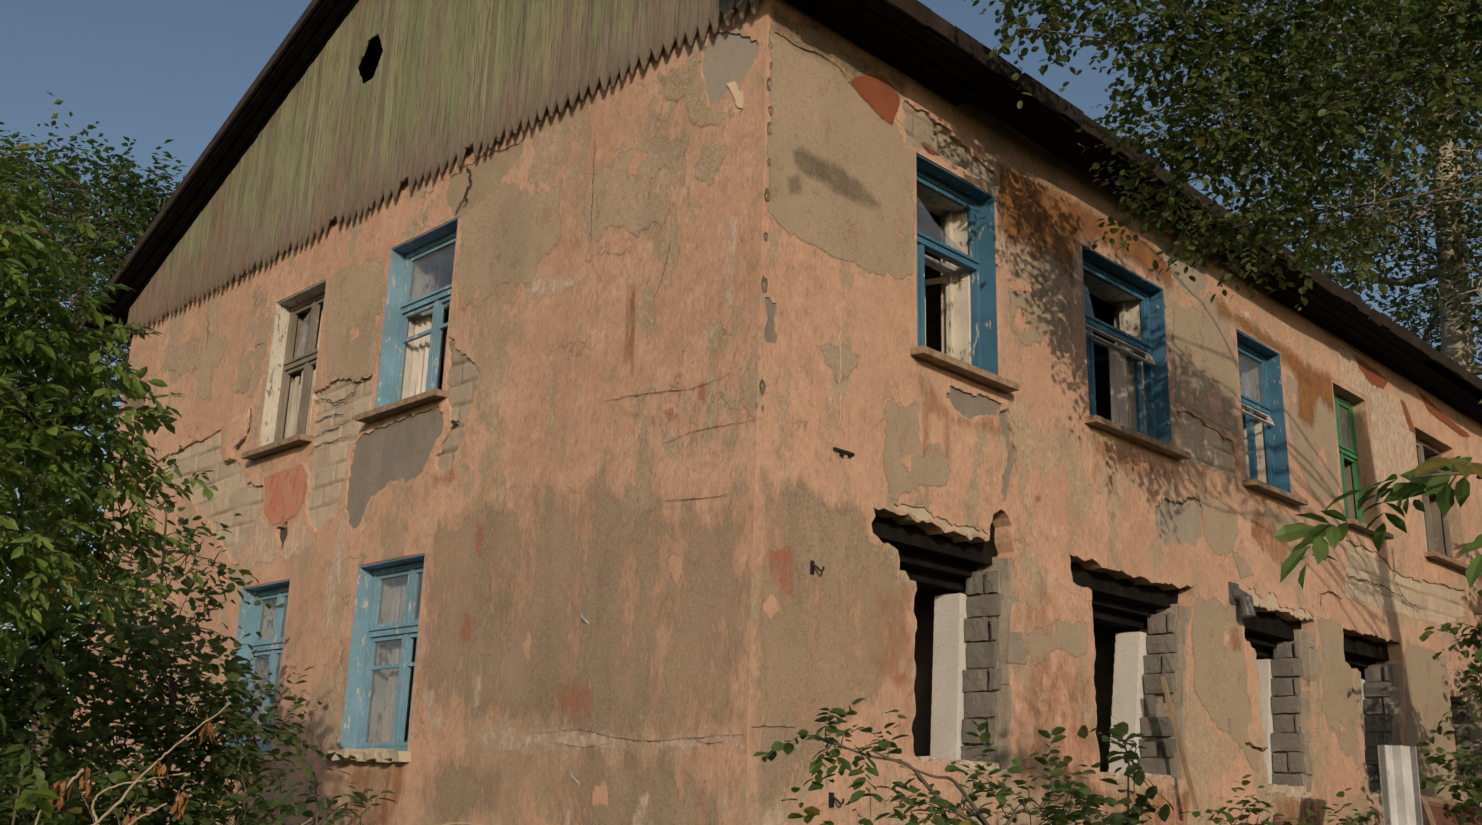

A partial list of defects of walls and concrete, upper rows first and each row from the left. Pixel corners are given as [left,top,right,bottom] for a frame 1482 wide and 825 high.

flaking render [156,314,480,562]